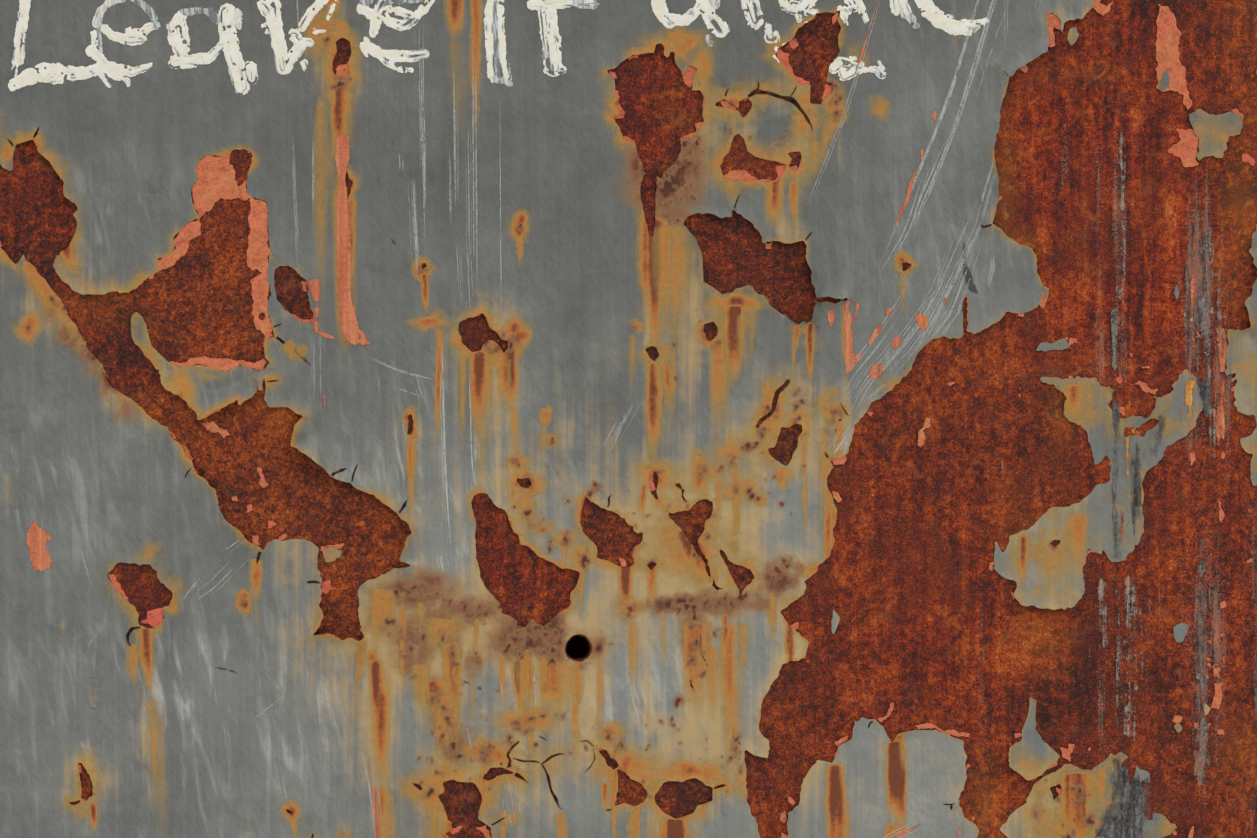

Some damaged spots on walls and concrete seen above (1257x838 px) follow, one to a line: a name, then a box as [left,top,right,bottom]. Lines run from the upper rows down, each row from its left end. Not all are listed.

peeling [0,127,425,662]
rust [307,0,358,323]
rust [412,259,591,601]
peeling [469,488,662,627]
rust [356,384,850,838]
rust [628,134,707,448]
peeling [603,44,752,237]
rust [696,293,761,410]
peeling [676,202,862,335]
peeling [743,0,1257,838]
peeling [595,743,712,822]
rust [884,733,907,838]